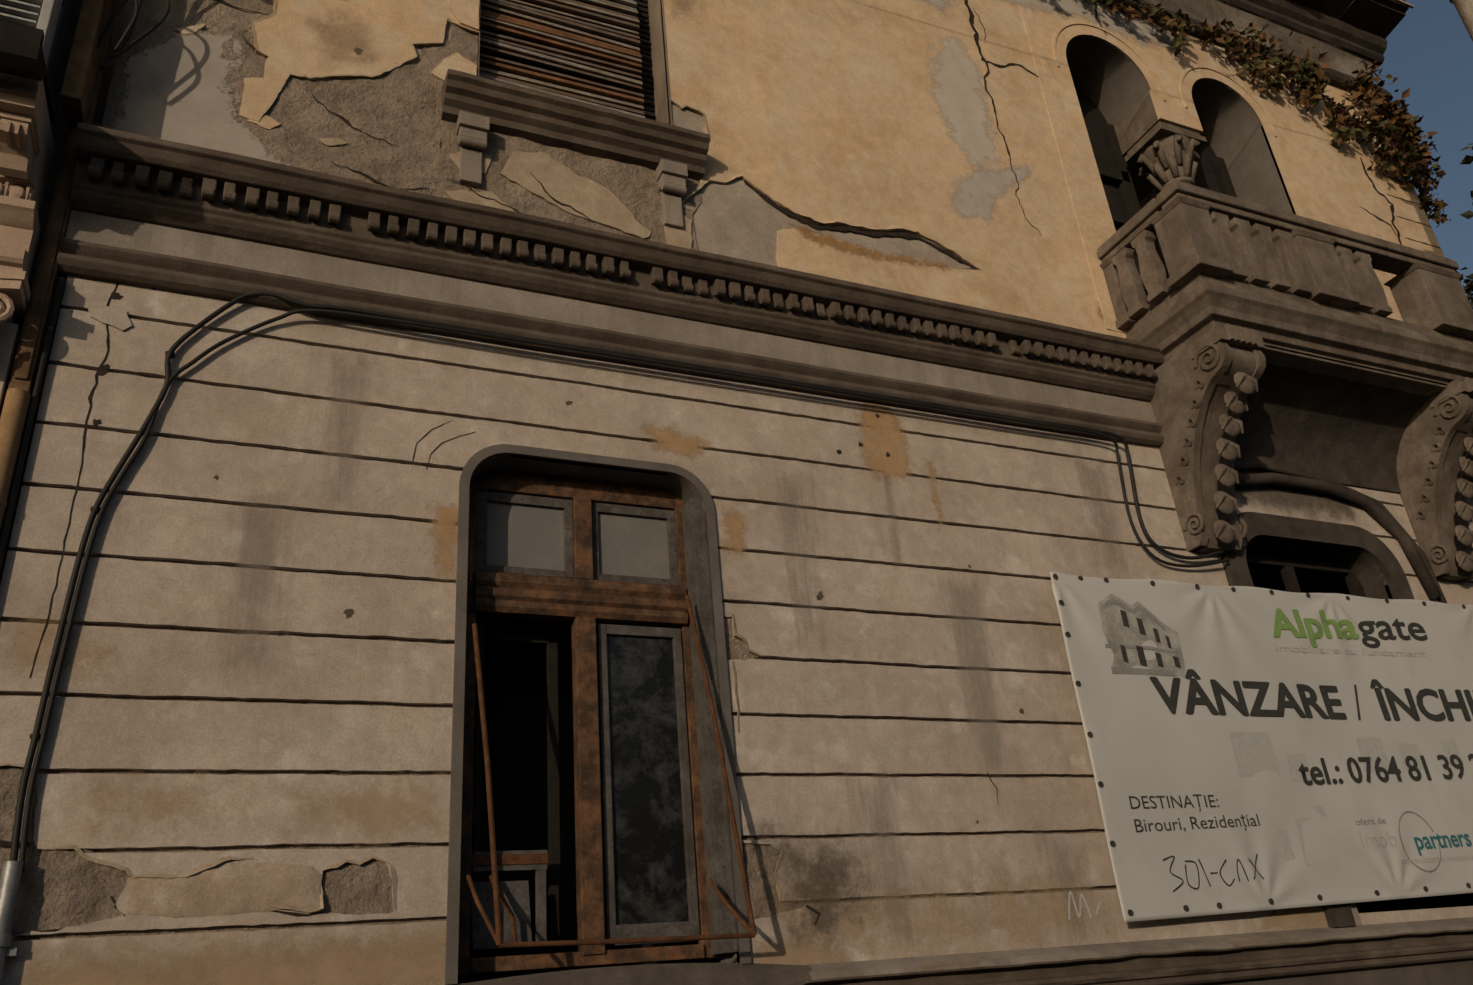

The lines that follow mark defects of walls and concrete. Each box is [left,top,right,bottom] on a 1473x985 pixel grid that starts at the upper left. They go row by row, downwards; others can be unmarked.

spalling [103,0,981,270]
crack [743,180,977,270]
peeling [952,164,1030,220]
crack [964,0,1041,235]
crack [29,283,156,678]
spalling [0,763,133,934]
spalling [321,856,398,915]